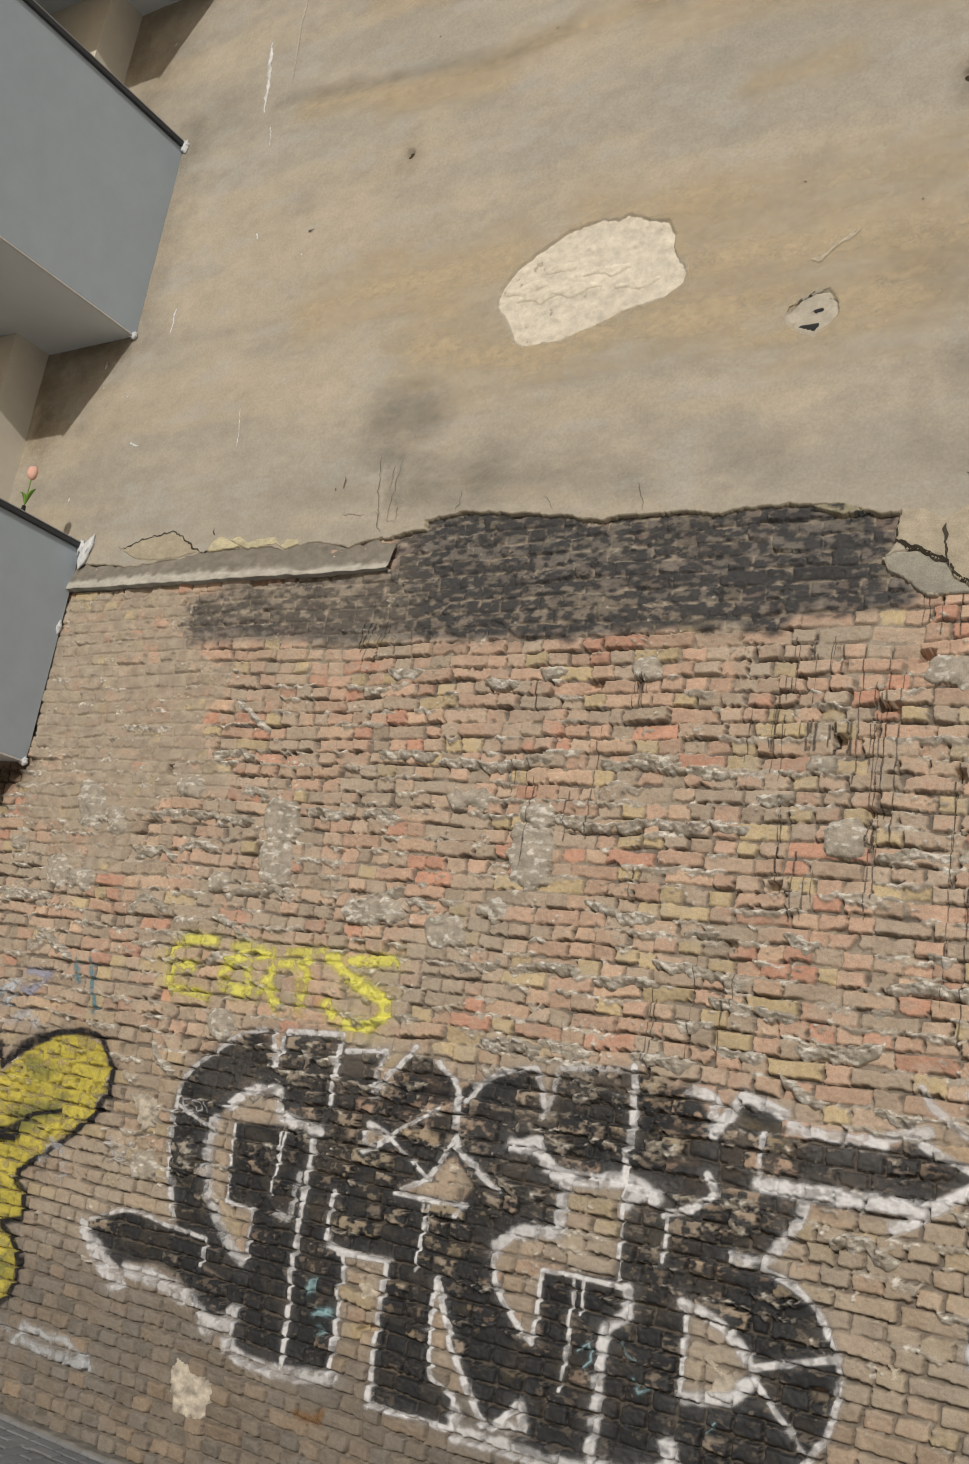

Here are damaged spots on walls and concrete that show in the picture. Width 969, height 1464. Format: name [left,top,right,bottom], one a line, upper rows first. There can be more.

flaking render [498,216,686,346]
flaking render [788,293,839,335]
flaking render [123,533,299,561]
crack [896,518,969,583]